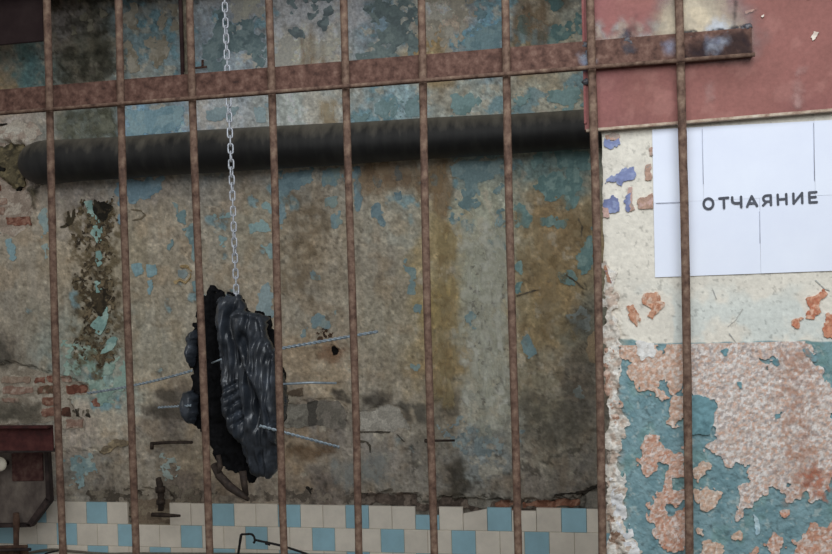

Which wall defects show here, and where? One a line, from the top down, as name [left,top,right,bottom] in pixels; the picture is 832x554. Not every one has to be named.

peeling [201,0,341,72]
peeling [355,0,419,60]
peeling [125,105,185,136]
flaking render [0,119,49,261]
peeling [447,155,505,233]
peeling [602,147,653,218]
peeling [0,176,165,431]
leakage [435,212,510,432]
leakage [363,391,390,407]
leakage [399,402,426,421]
flaking render [286,227,832,554]
leakage [447,460,470,499]